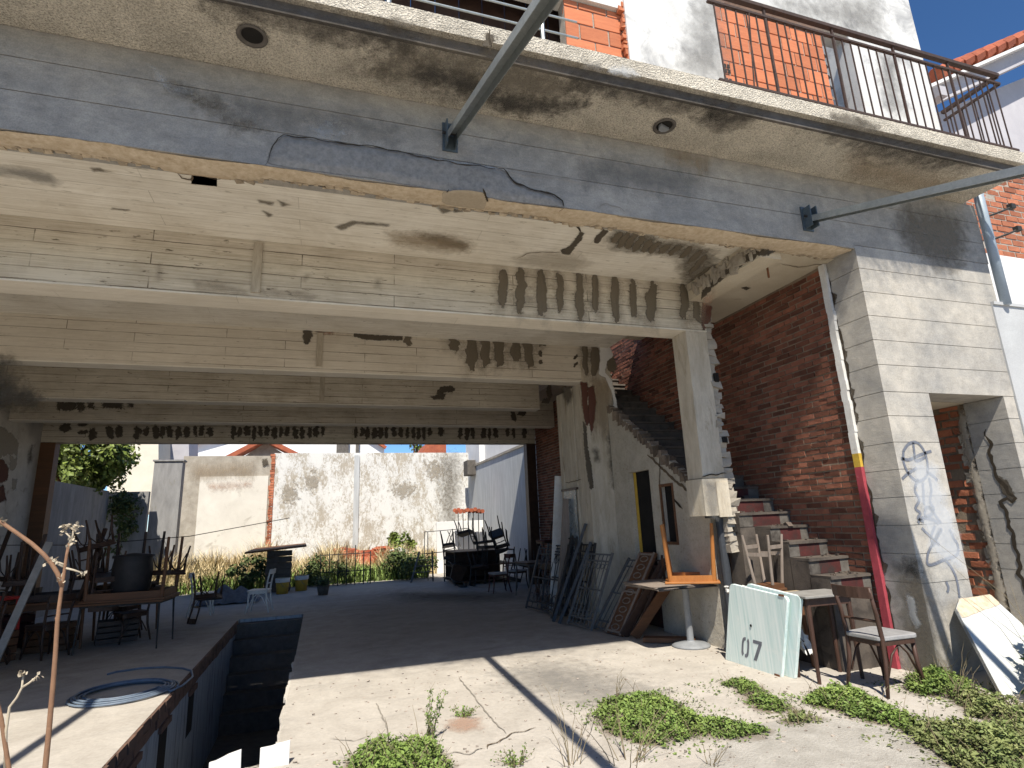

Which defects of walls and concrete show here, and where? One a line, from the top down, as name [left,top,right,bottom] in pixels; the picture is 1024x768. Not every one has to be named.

water stain [828,124,972,185]
crack [266,134,584,258]
peeling [0,131,851,304]
spalling [302,330,332,345]
spalling [354,333,412,347]
spalling [580,347,689,491]
spalling [704,319,741,553]
crack [334,703,388,741]
crack [443,677,535,755]